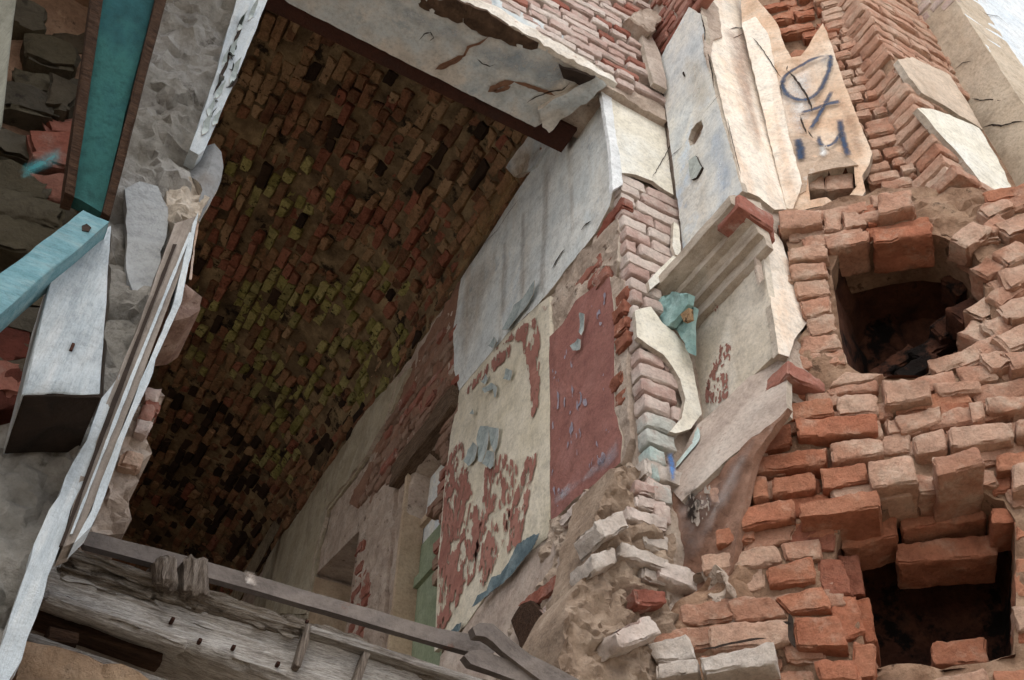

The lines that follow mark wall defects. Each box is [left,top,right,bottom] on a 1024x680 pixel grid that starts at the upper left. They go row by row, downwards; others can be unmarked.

spalling [163,0,279,234]
crack [435,37,568,103]
crack [731,27,813,137]
crack [972,98,1023,127]
spalling [348,0,1024,680]